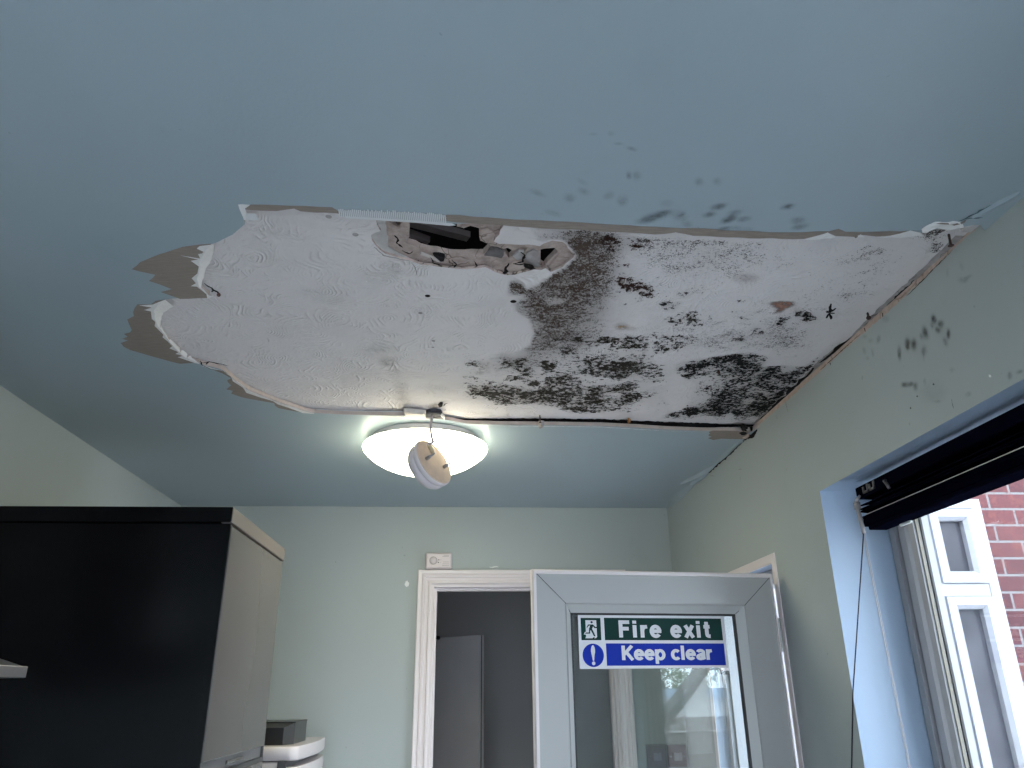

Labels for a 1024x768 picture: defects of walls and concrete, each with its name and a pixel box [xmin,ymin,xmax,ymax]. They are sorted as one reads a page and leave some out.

spalling [185,244,218,301]
spalling [140,300,314,414]
damp [457,230,904,427]
flaking render [739,221,980,441]
damp [918,229,945,253]